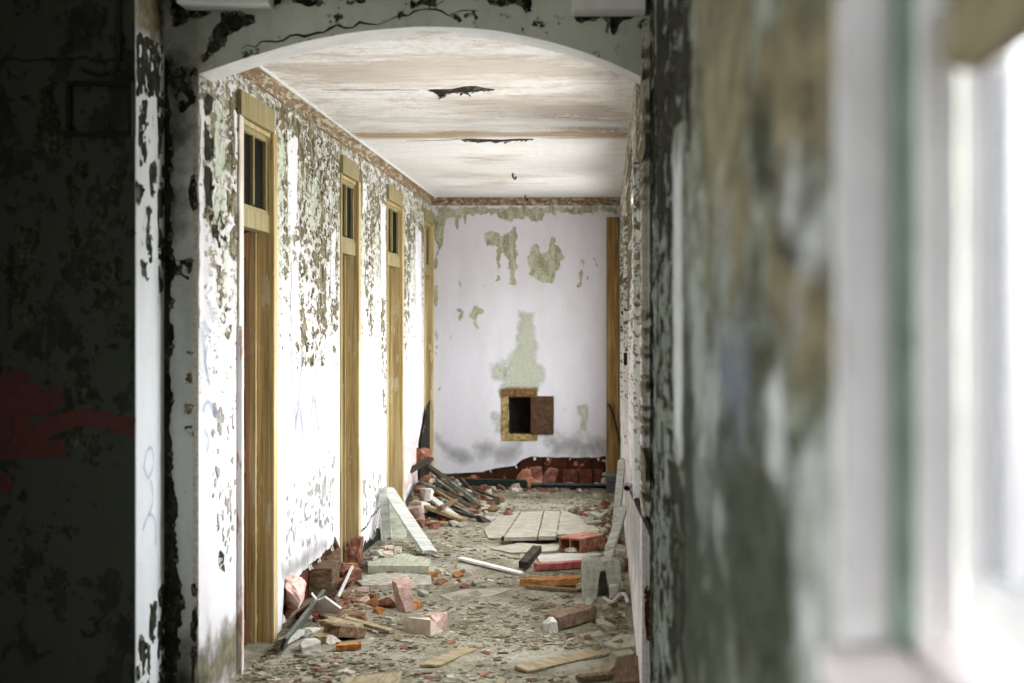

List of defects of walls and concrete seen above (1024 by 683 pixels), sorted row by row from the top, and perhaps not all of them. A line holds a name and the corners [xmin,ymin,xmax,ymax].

crack [241,1,479,49]
peeling [135,0,256,683]
peeling [274,98,340,369]
peeling [359,161,387,415]
peeling [404,0,843,683]
peeling [282,451,339,624]
peeling [362,464,382,553]